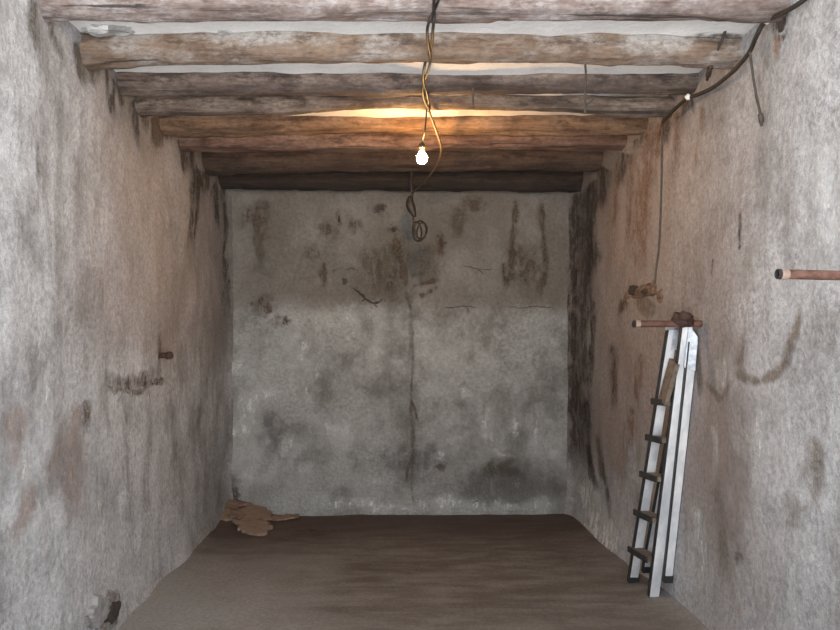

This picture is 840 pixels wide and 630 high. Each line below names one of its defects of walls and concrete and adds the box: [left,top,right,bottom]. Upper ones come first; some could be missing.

damp [178,140,230,293]
crack [333,267,384,308]
damp [362,238,441,301]
damp [503,201,547,287]
damp [567,153,629,503]
damp [696,315,800,398]
crack [406,385,418,479]
damp [321,451,550,513]
flaking render [84,589,121,630]